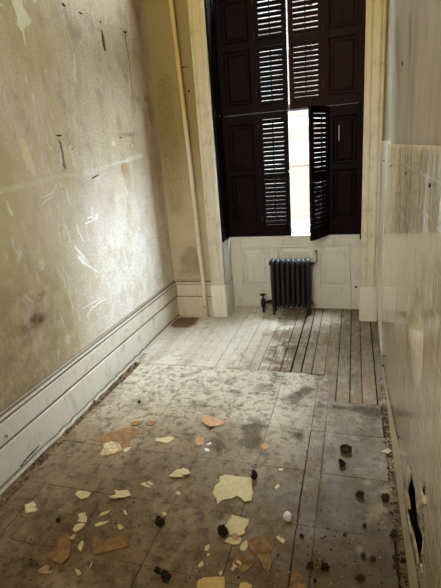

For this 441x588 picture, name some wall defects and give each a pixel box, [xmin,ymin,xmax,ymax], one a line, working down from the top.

spalling [402,466,425,586]